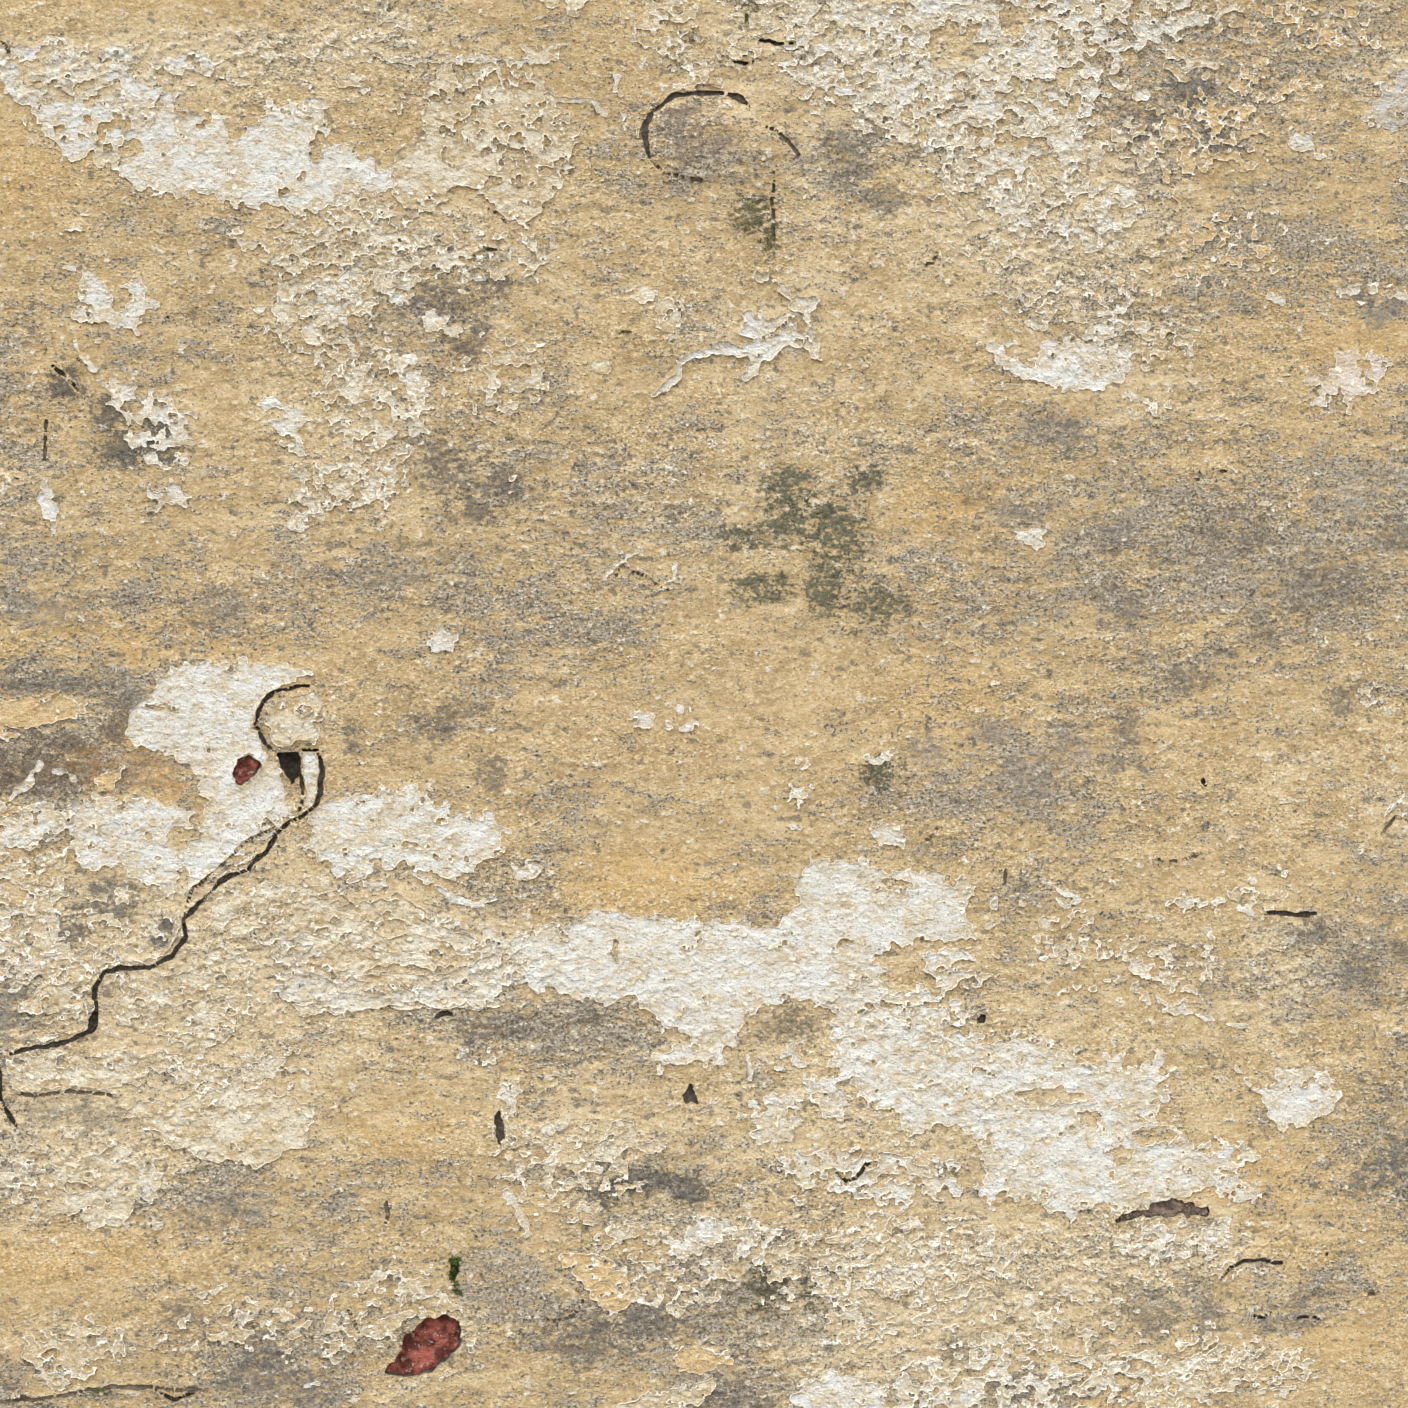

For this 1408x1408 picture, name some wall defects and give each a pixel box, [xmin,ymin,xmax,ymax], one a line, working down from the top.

crack [641,14,800,237]
peeling [0,0,1393,532]
peeling [1336,282,1408,306]
water stain [715,461,914,636]
crack [0,684,325,1127]
peeling [0,656,1315,1408]
peeling [1235,1065,1343,1133]
crack [0,1384,199,1404]